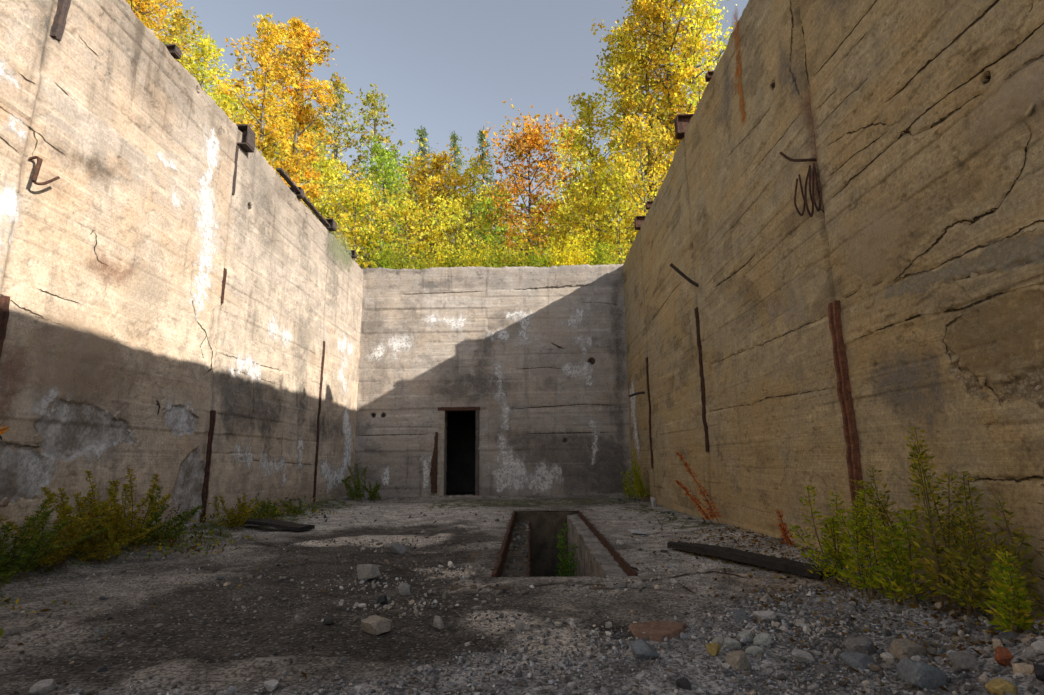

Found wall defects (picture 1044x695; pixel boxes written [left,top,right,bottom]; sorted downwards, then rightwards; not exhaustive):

corrosion [733,12,745,121]
crack [0,106,65,156]
efflorescence [0,188,18,221]
efflorescence [188,128,219,319]
crack [845,124,1044,405]
peeling [0,397,137,506]
damp [439,307,640,494]
crack [714,315,828,363]
crack [710,387,834,412]
spalling [947,349,1044,408]